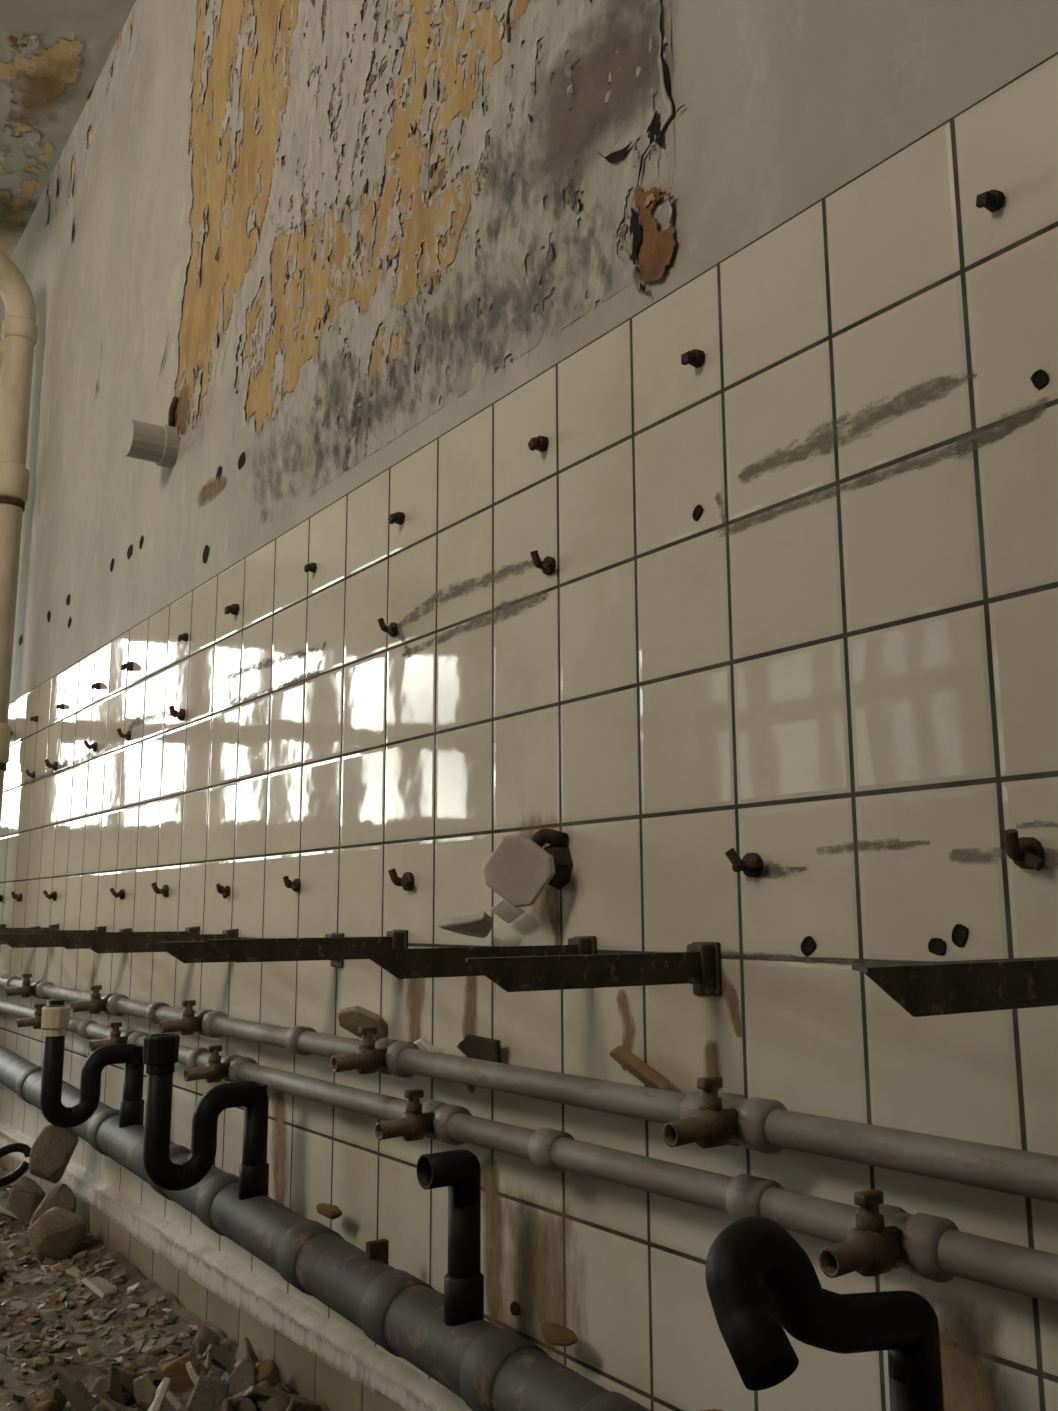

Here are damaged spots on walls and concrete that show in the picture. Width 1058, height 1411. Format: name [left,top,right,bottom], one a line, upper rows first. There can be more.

water stain [0,195,36,233]
peeling [0,0,146,257]
peeling [167,0,675,493]
water stain [405,228,609,399]
water stain [485,0,660,237]
water stain [252,350,415,518]
corrosion [939,1312,1002,1411]